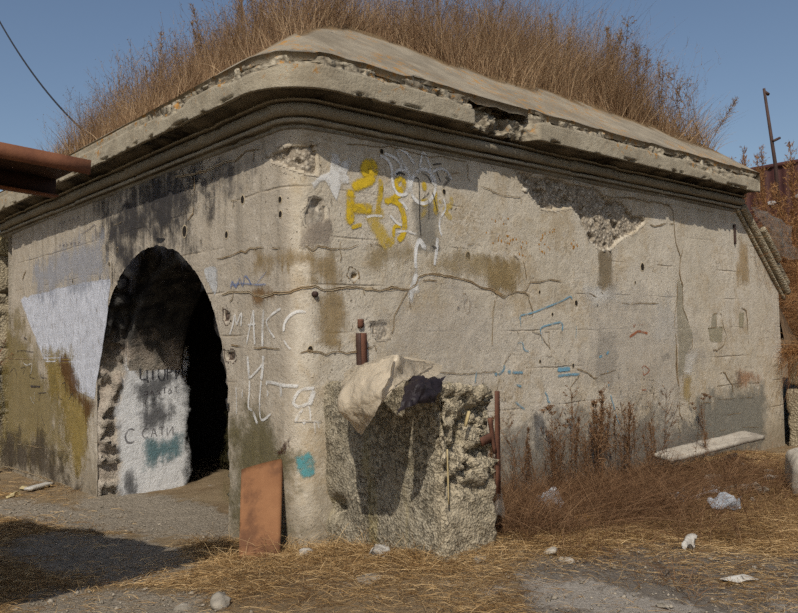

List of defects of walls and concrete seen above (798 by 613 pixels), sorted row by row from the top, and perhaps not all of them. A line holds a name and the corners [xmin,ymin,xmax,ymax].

spalling [265,141,321,177]
spalling [515,170,646,252]
leakage [281,254,345,345]
crack [221,255,560,357]
leakage [440,254,520,289]
leakage [584,251,616,304]
crack [606,195,693,385]
leakage [0,311,89,491]
crack [442,353,514,401]
crack [704,372,760,431]